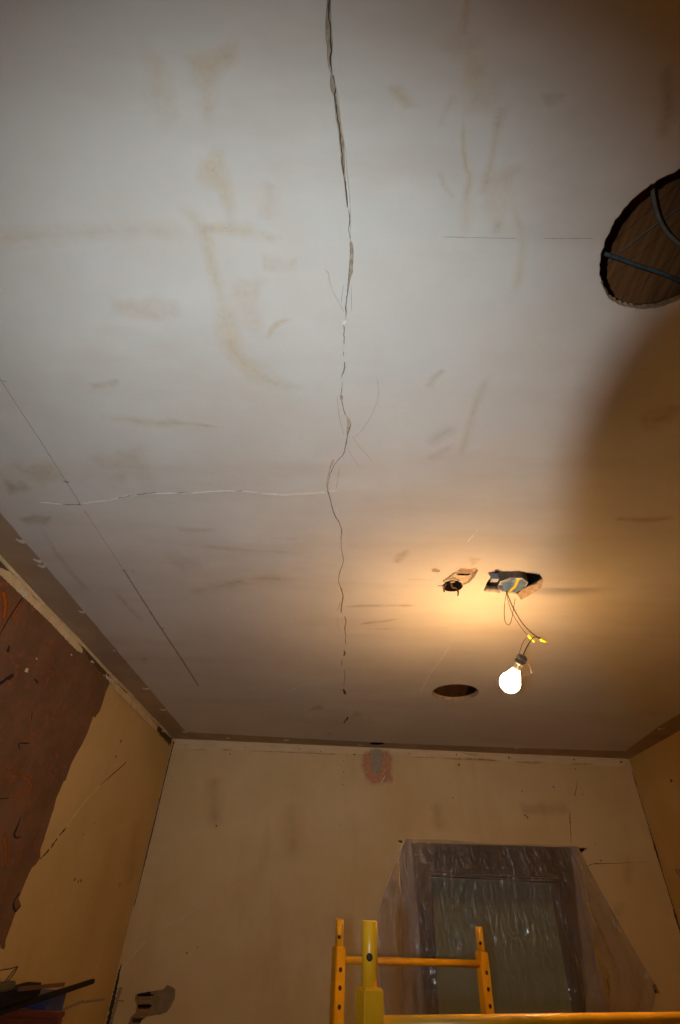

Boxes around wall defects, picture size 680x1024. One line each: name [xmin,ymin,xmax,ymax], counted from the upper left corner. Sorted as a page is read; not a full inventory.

crack [40,0,379,723]
peeling [0,562,630,949]
spalling [129,985,176,1024]